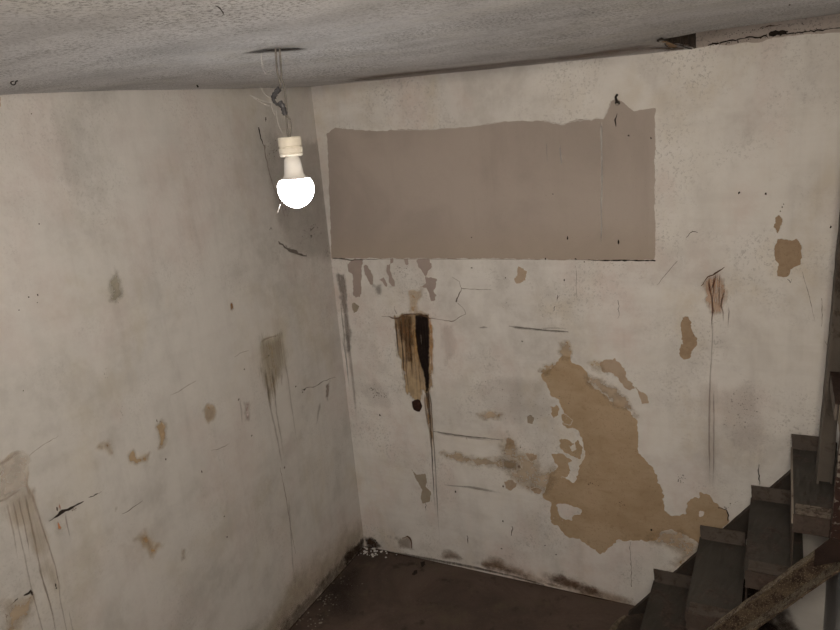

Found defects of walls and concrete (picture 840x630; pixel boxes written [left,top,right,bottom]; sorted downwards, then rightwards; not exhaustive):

crack [708,27,840,46]
flaking render [323,99,656,313]
peeling [773,204,803,283]
crack [382,278,491,322]
rust [701,267,729,318]
peeling [679,316,698,360]
rust [394,314,437,496]
peeling [530,343,729,555]
crack [50,493,99,529]